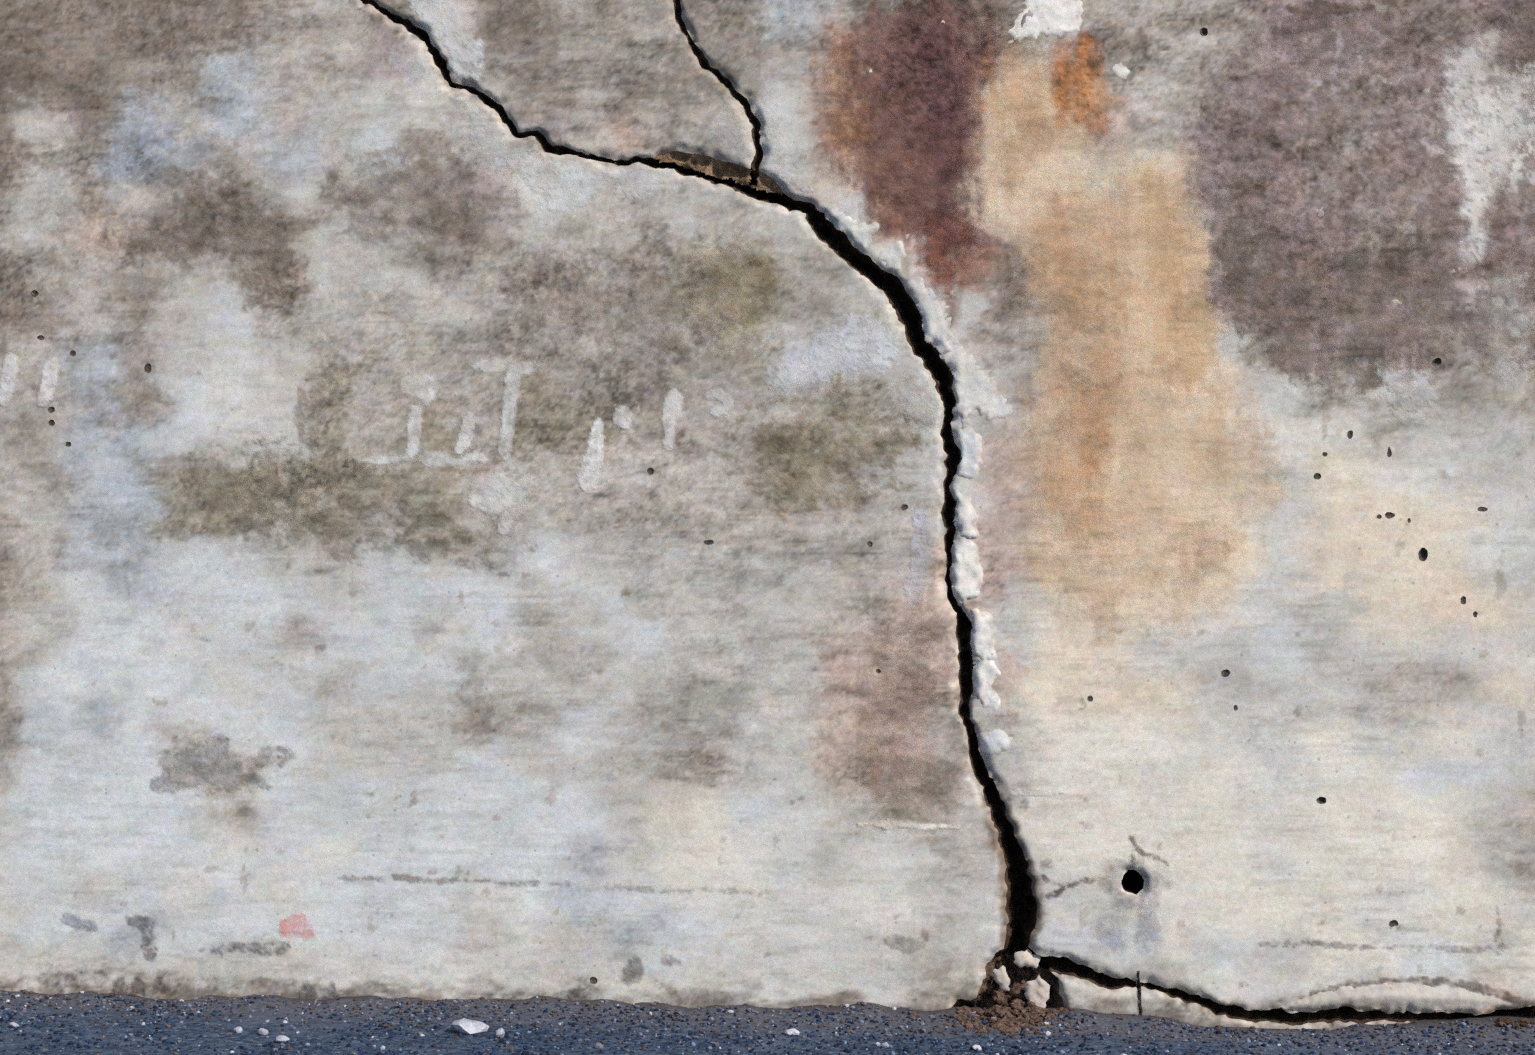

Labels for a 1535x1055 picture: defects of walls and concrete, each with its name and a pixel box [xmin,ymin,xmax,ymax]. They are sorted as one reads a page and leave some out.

rust [830,0,995,272]
rust [1054,34,1107,131]
leakage [1386,0,1535,274]
crack [339,0,1535,1026]